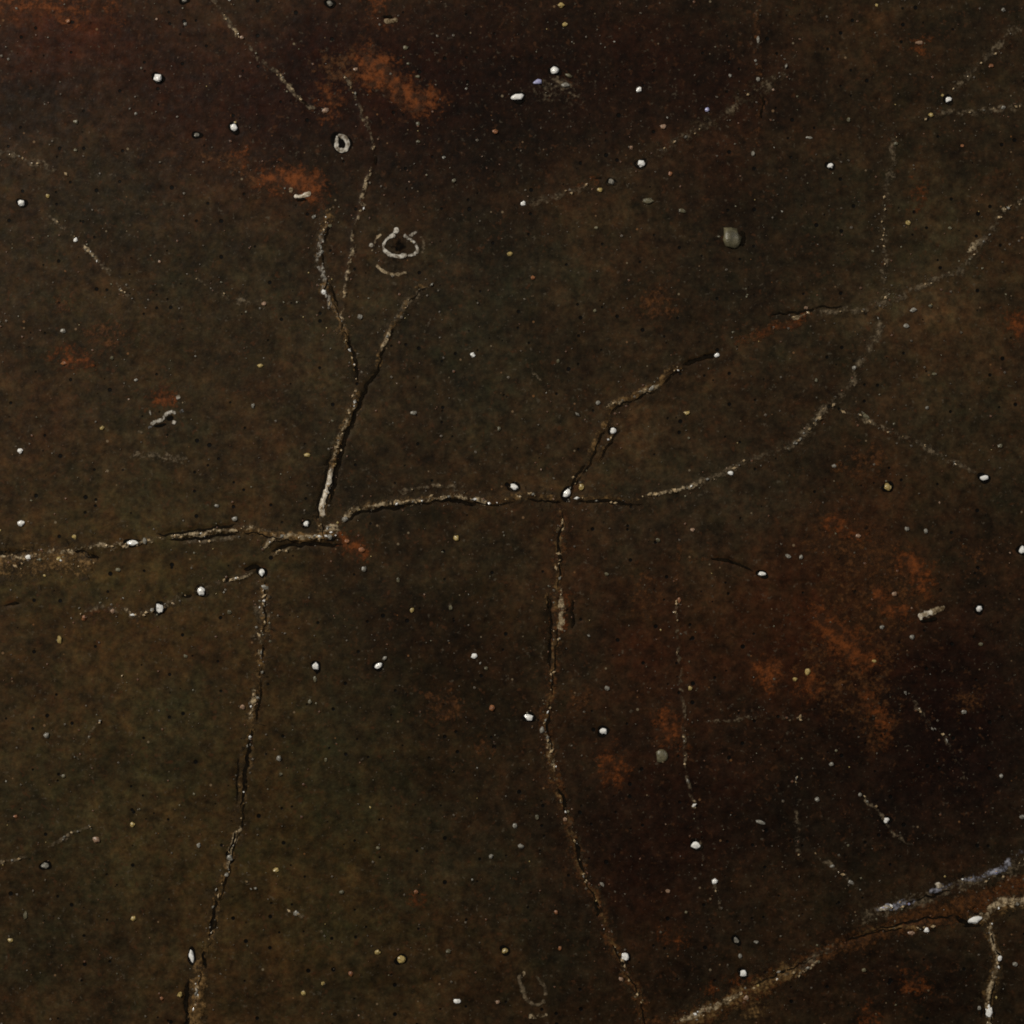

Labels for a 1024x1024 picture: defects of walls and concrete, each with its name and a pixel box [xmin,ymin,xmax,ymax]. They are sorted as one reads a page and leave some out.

crack [344,77,377,220]
corrosion [312,38,445,125]
crack [657,10,788,155]
crack [0,207,1024,1024]
corrosion [752,509,937,756]